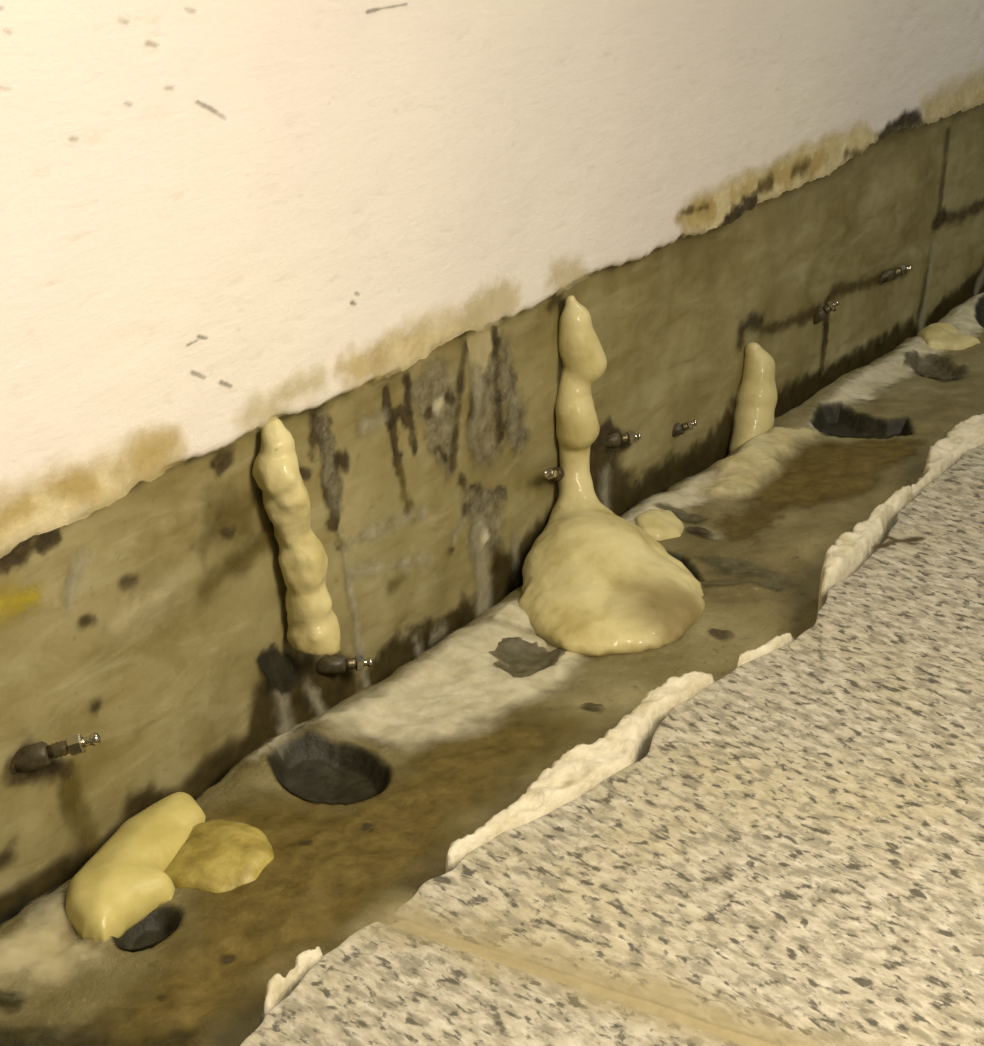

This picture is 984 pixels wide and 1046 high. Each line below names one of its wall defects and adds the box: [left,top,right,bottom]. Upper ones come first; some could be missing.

flaking render [680,74,984,233]
water stain [350,285,516,378]
water stain [774,269,984,418]
peeling [0,434,172,553]
water stain [203,497,275,593]
spalling [299,403,349,531]
spalling [383,325,527,555]
water stain [590,399,923,539]
spalling [818,414,984,611]
spalling [737,633,795,668]
water stain [0,514,581,1046]
spalling [445,671,715,873]